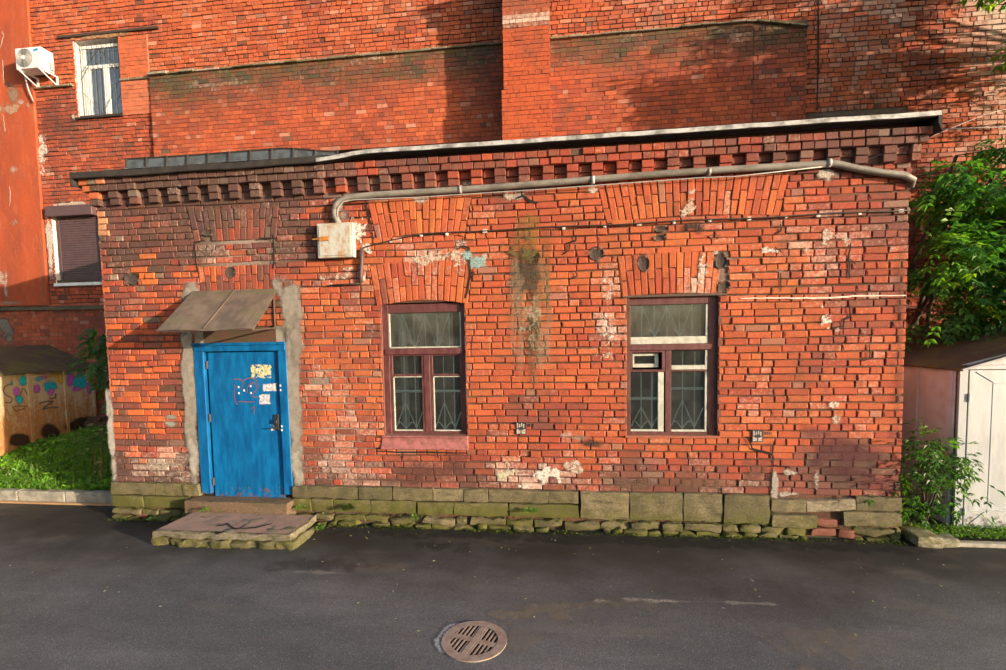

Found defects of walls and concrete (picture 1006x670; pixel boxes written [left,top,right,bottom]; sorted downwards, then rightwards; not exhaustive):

peeling [0,83,29,114]
peeling [38,135,48,175]
peeling [405,240,467,274]
leakage [509,234,546,384]